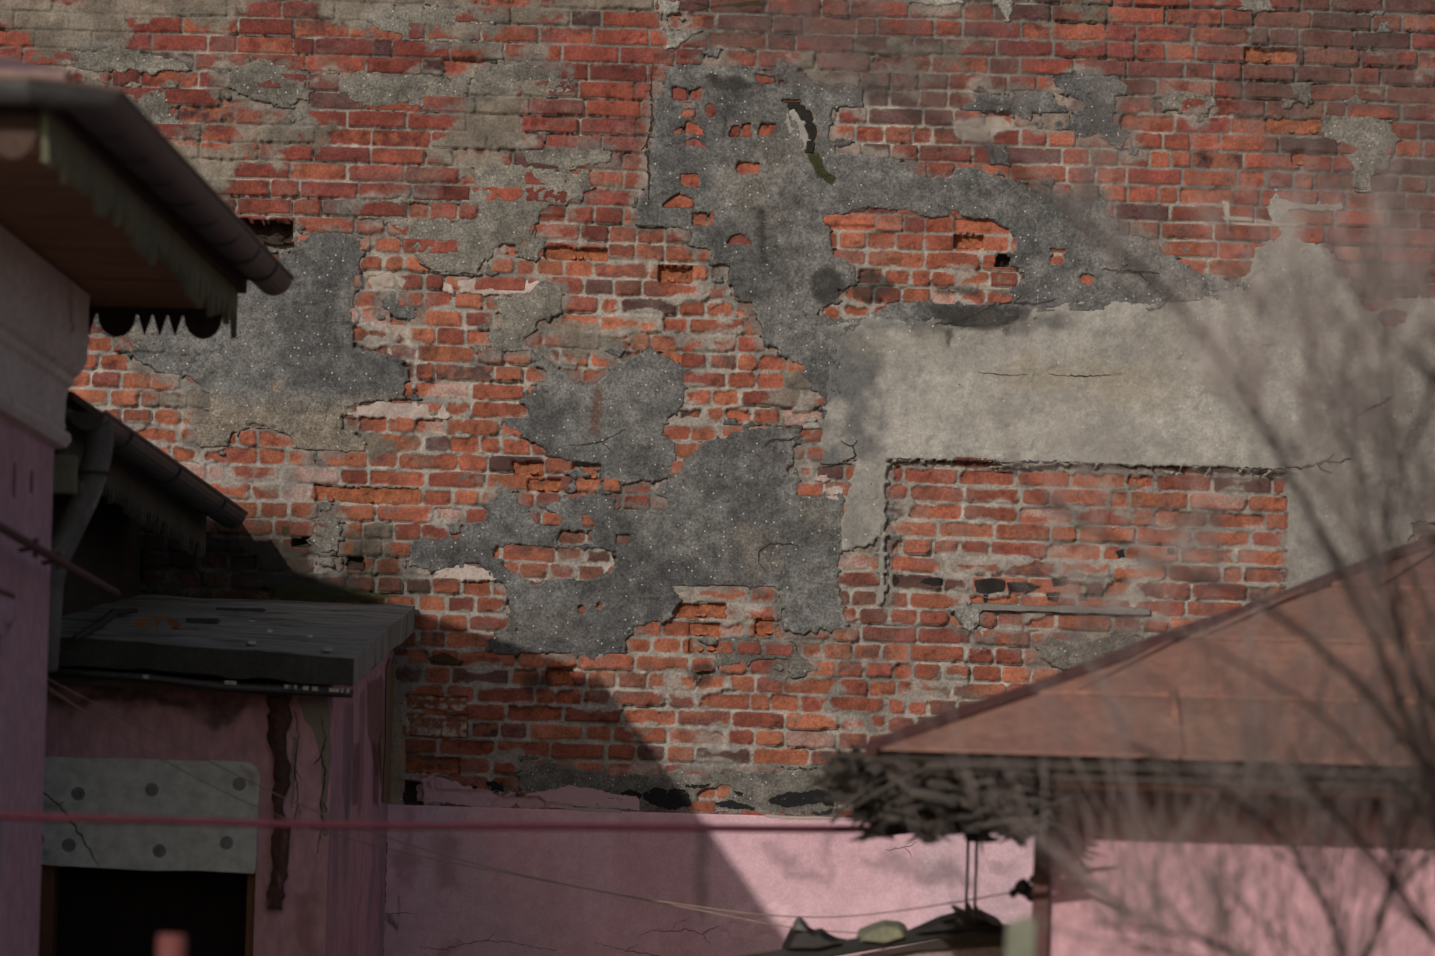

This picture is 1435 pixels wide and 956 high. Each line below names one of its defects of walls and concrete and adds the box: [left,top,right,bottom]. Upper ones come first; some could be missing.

flaking render [66,46,192,124]
flaking render [93,0,1435,687]
peeling [300,698,332,836]
flaking render [403,754,840,817]
crack [383,821,556,954]
crack [594,918,719,956]